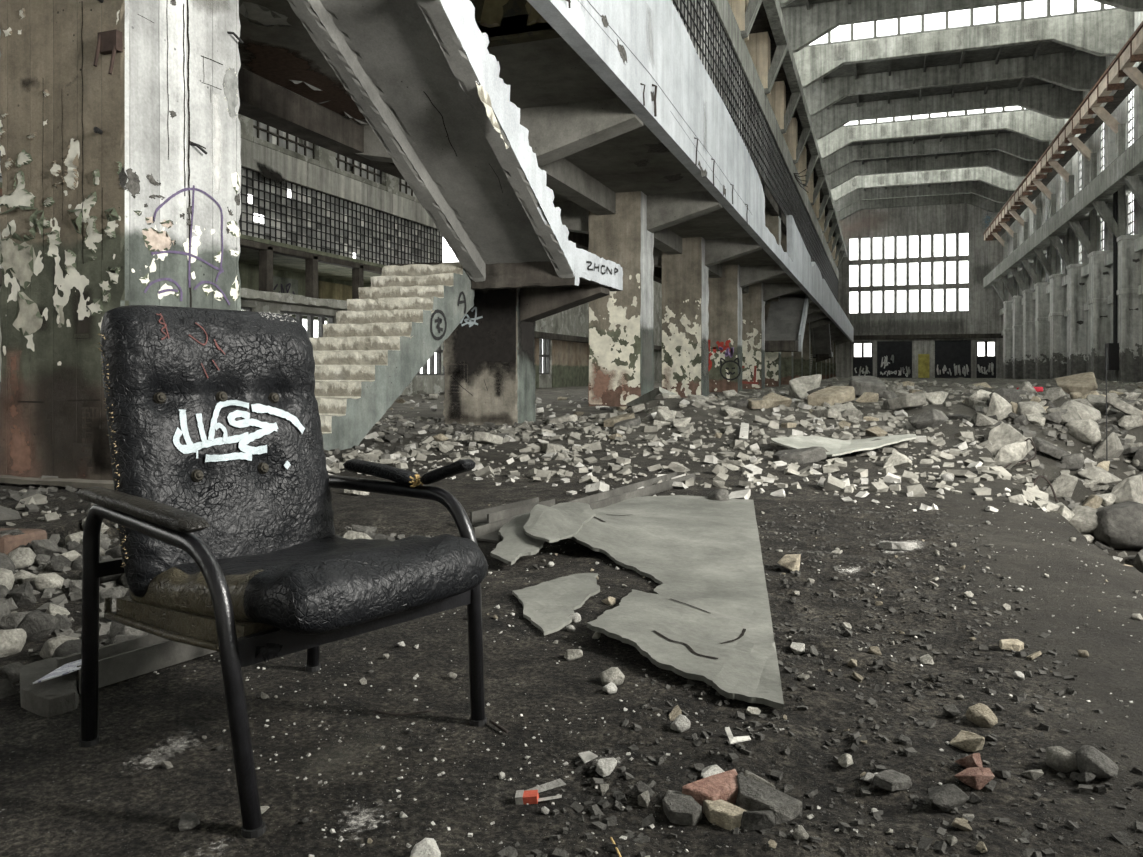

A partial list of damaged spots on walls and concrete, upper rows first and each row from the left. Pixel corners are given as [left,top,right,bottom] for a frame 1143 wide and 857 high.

peeling [0,112,240,351]
rust [6,354,33,477]
damp [448,369,512,423]
peeling [589,274,640,405]
peeling [662,298,778,396]